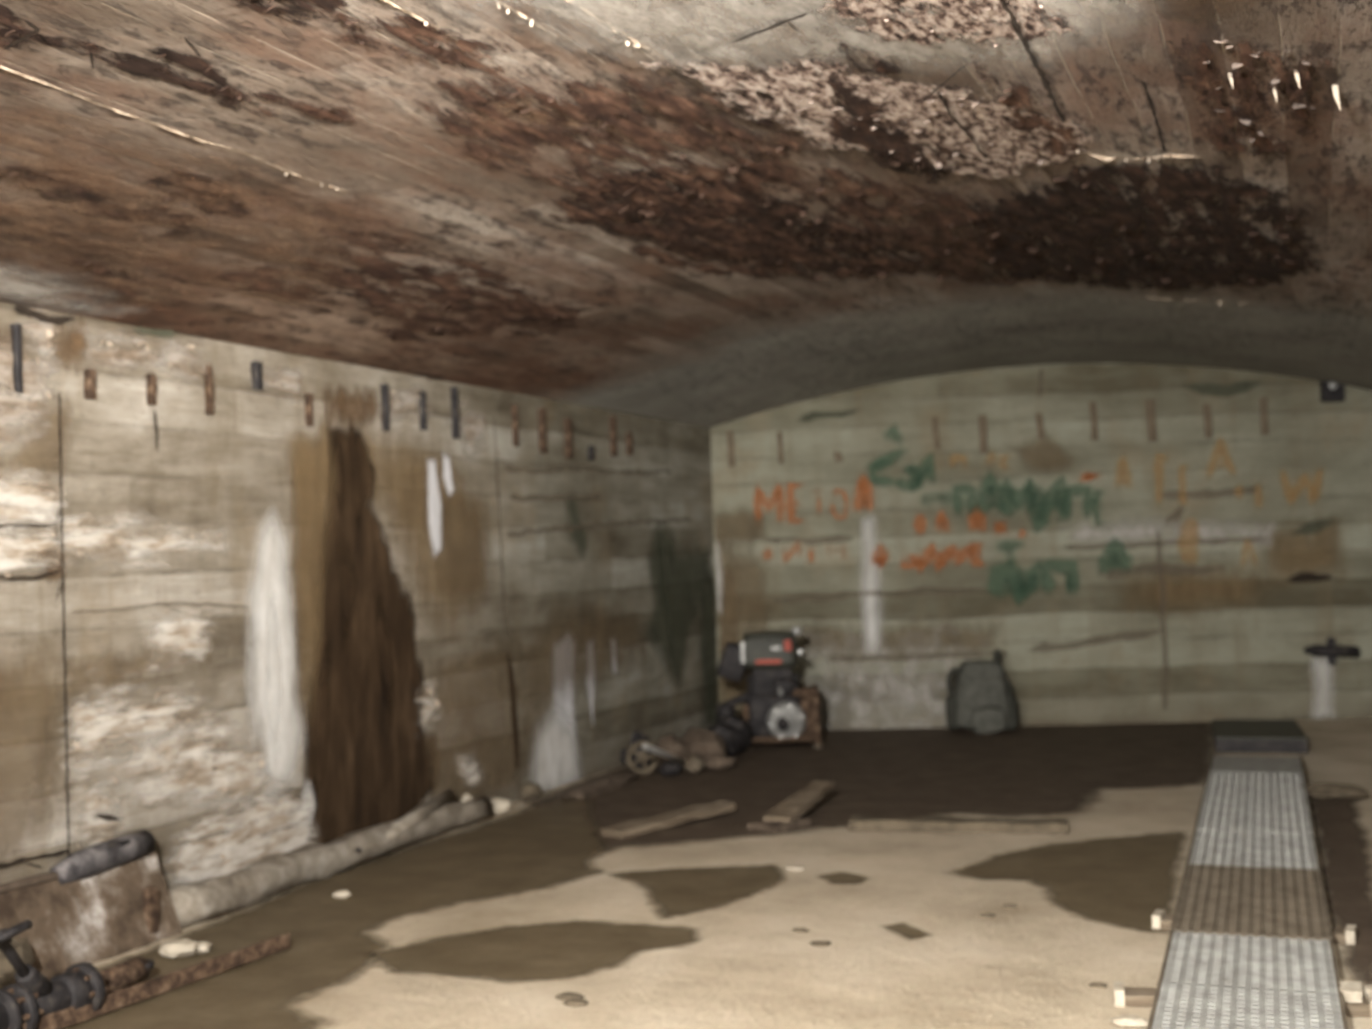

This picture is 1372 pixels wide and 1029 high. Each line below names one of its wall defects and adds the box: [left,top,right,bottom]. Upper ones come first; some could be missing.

crack [5,20,41,49]
spalling [0,5,356,125]
crack [184,38,200,56]
spalling [0,166,252,237]
spalling [236,0,1336,306]
spalling [215,227,598,341]
leakage [252,424,480,844]
leakage [650,528,720,724]
leakage [865,522,878,653]
leakage [62,636,1215,1029]